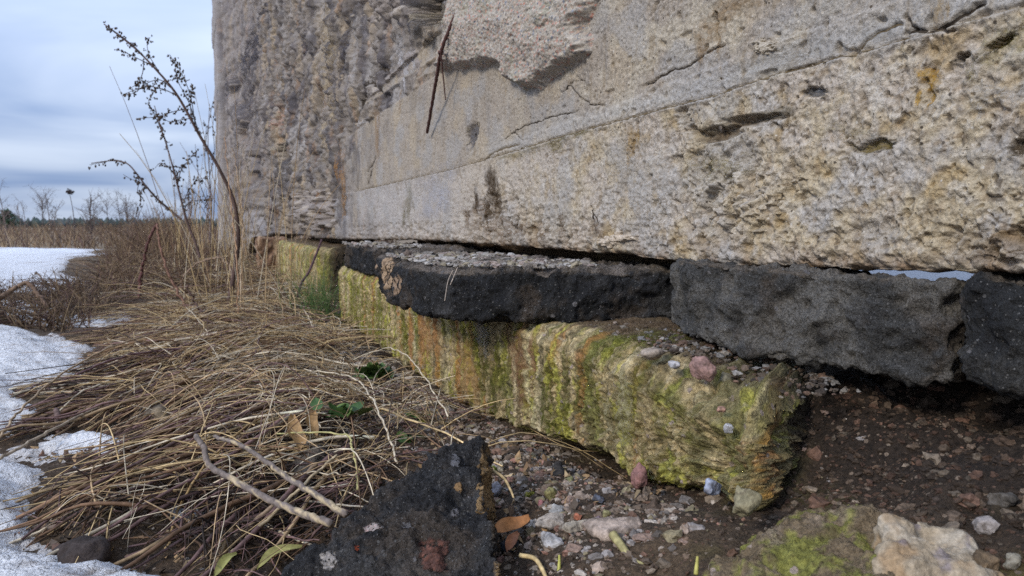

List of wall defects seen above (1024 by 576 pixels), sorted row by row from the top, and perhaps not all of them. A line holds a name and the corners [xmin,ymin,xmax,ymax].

spalling [368,0,600,134]
crack [354,4,1022,192]
water stain [466,170,502,220]